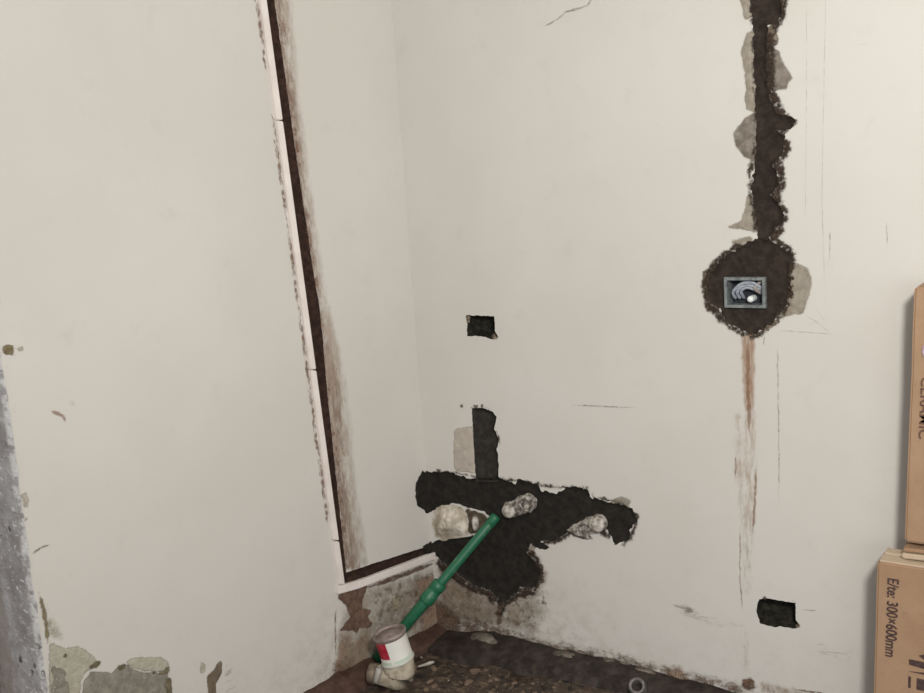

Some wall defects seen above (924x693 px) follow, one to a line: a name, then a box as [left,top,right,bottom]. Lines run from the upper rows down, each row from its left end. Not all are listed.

spalling [701,236,811,339]
rust [743,337,754,428]
spalling [415,469,639,616]
peeling [49,644,172,693]
peeling [200,661,222,693]
peeling [334,586,372,673]
leakage [344,575,434,667]
leakage [412,580,755,693]